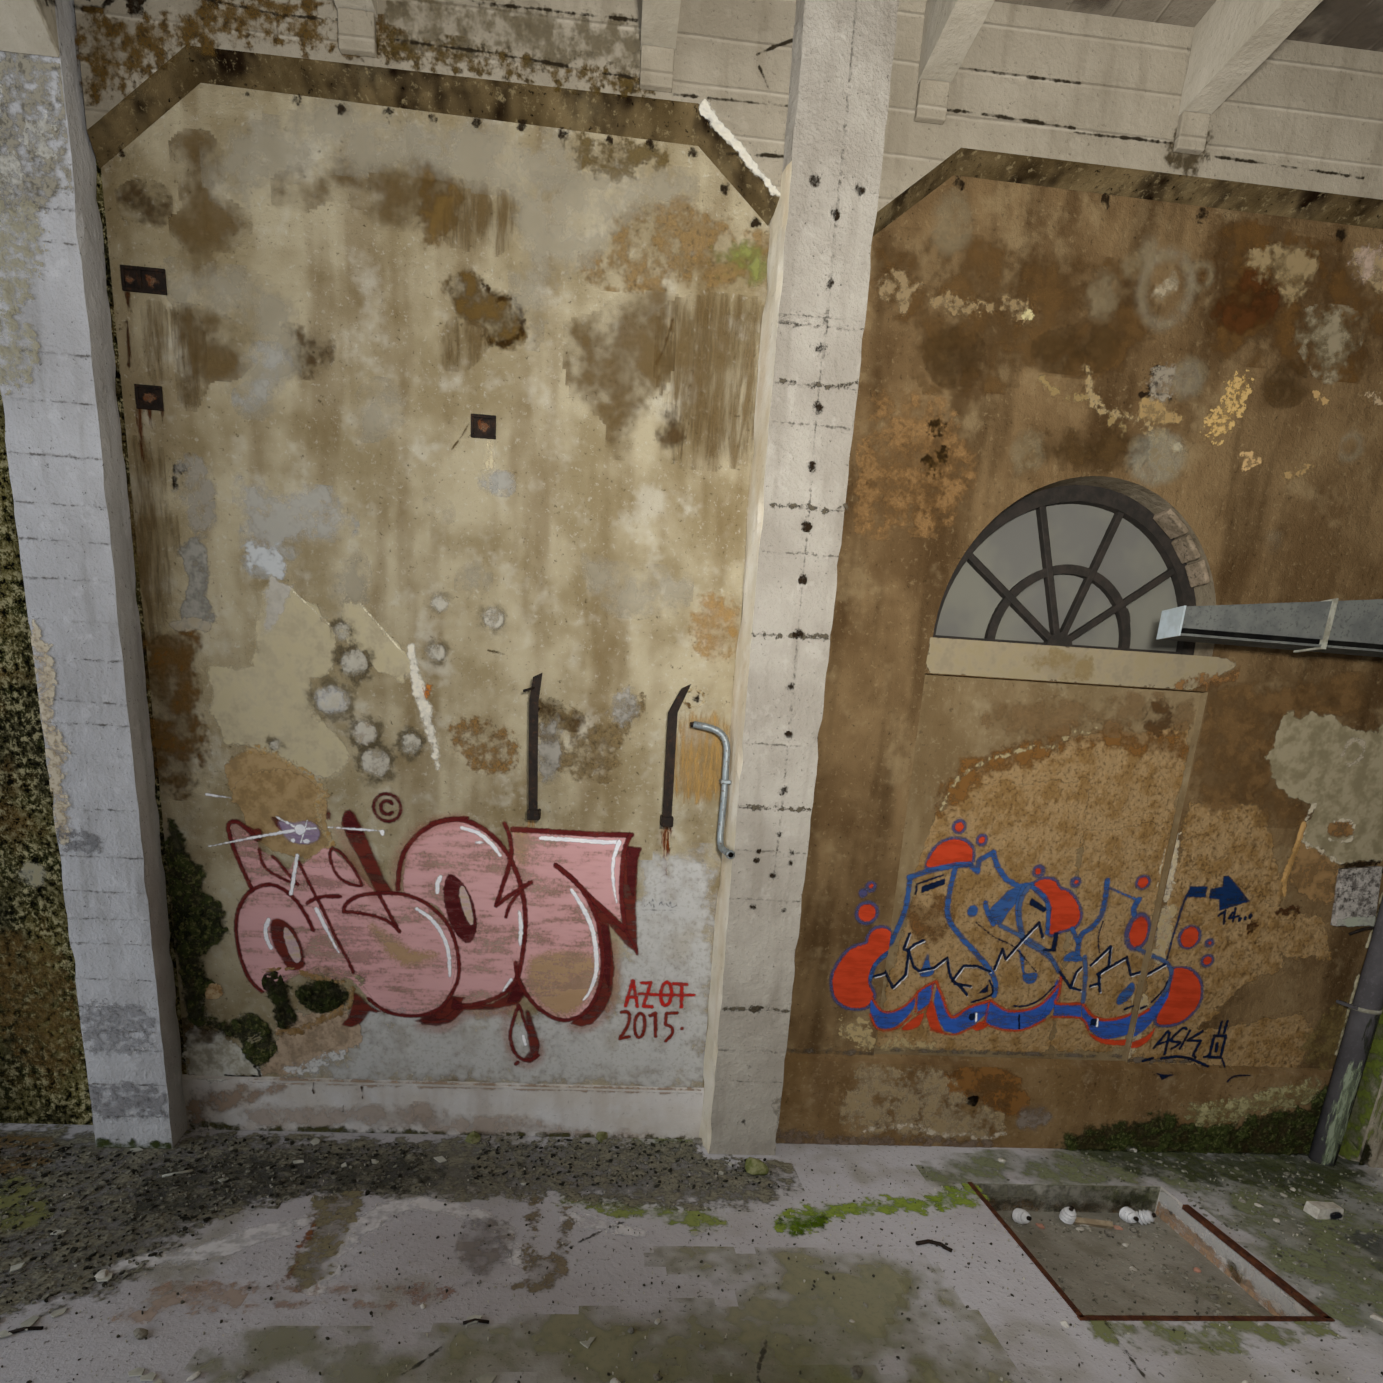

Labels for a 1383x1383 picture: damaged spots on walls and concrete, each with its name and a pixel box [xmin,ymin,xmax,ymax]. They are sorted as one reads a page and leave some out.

peeling [0,51,73,395]
leakage [118,182,238,250]
leakage [376,163,508,244]
leakage [174,315,240,390]
leakage [445,271,528,358]
flaking render [169,456,216,632]
peeling [208,575,411,862]
leakage [56,826,101,855]
rust [661,827,671,876]
flaking render [838,671,1367,1068]
leakage [0,930,154,1080]
leakage [88,1081,168,1119]